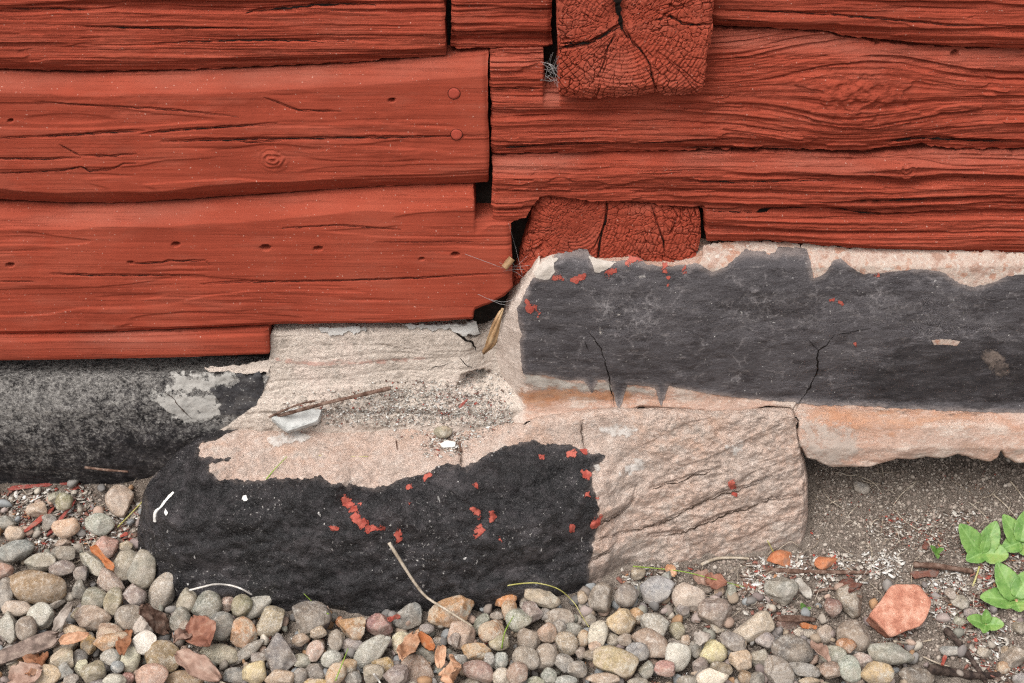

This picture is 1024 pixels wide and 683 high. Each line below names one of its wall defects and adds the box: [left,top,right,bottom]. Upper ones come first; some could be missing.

crack [560,0,655,93]
crack [589,201,608,258]
peeling [534,256,558,280]
peeling [589,256,616,273]
peeling [699,241,1024,287]
peeling [319,325,374,336]
peeling [402,320,482,337]
peeling [152,360,271,424]
crack [585,334,651,409]
crack [794,328,870,453]
spalling [982,350,1008,376]